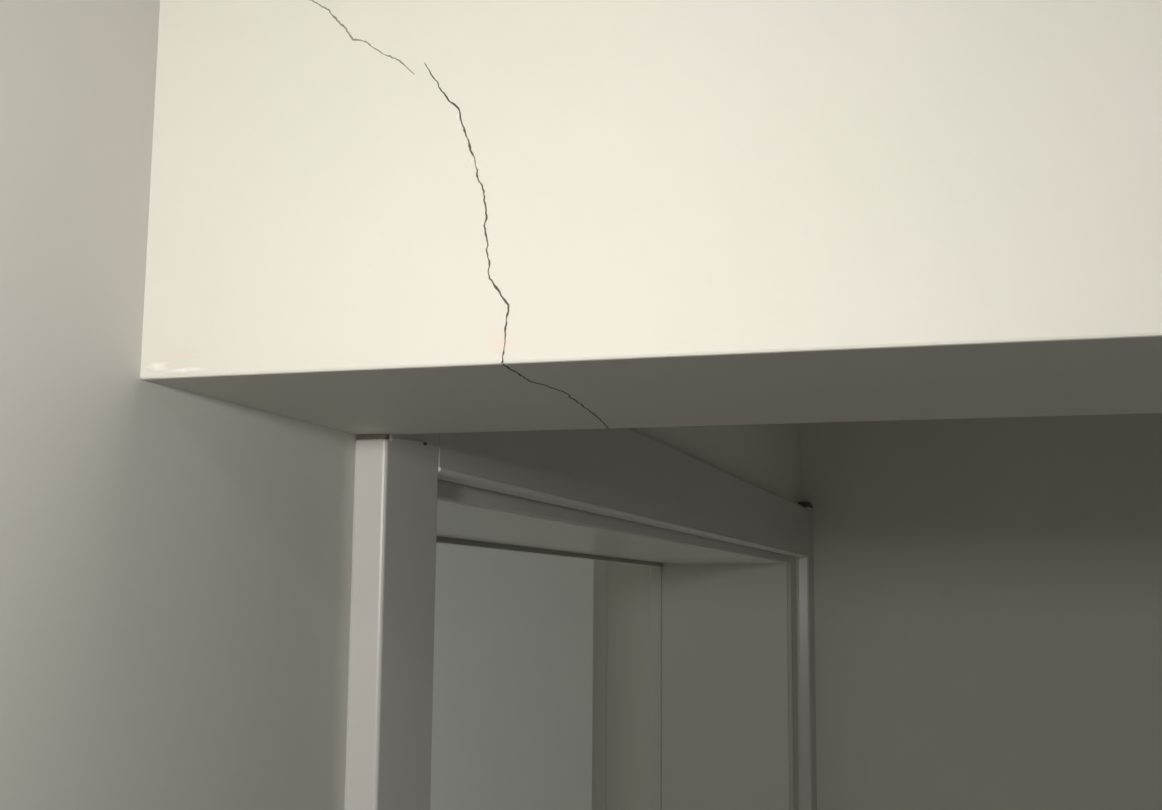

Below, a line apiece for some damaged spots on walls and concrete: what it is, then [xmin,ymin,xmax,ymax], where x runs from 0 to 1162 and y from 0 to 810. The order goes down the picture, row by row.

crack [310,0,608,429]